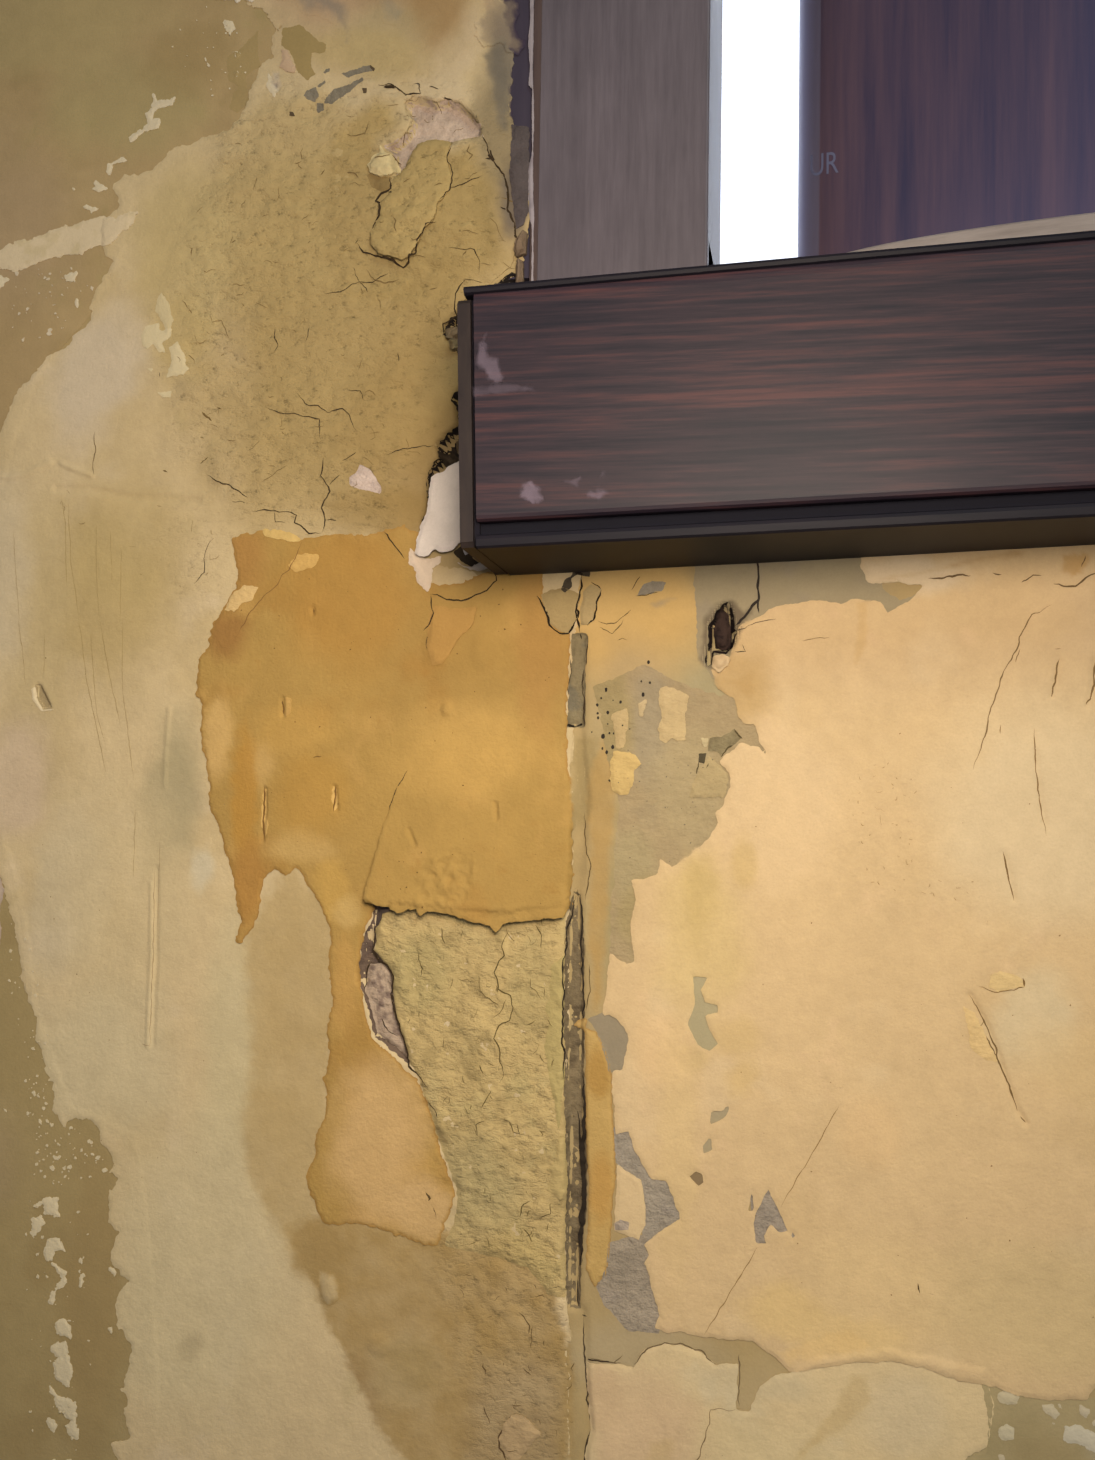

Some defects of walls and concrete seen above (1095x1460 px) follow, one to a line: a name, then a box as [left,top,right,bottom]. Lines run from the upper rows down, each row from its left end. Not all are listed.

peeling [0,0,375,250]
peeling [0,245,113,432]
crack [178,135,517,637]
spalling [426,391,459,498]
peeling [593,558,916,964]
peeling [0,877,132,1460]
crack [364,927,445,1116]
peeling [195,517,680,1334]
crack [461,814,757,1460]
peeling [750,1190,795,1243]
crack [785,1108,838,1199]
peeling [966,1384,1095,1460]